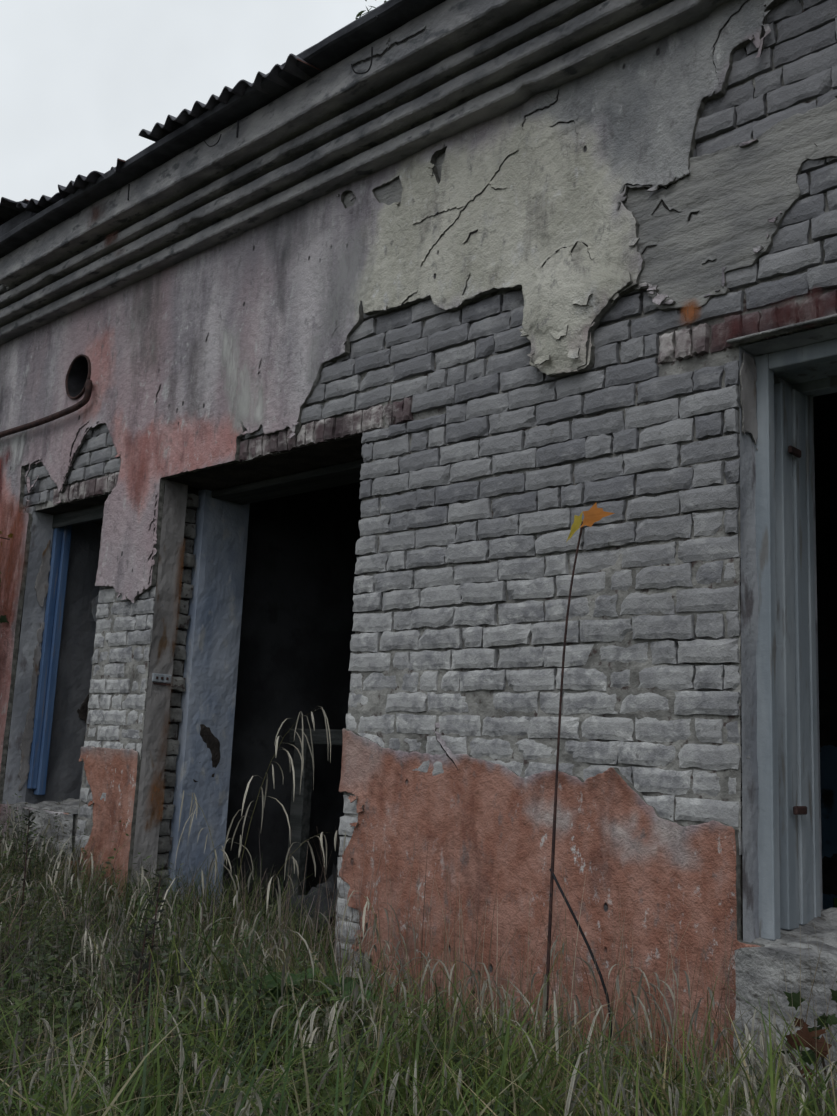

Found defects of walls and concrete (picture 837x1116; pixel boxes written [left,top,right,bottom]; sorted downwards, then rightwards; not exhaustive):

crack [400,90,581,306]
spalling [22,423,121,532]
spalling [237,0,837,855]
spalling [71,579,164,861]
spalling [822,853,837,895]